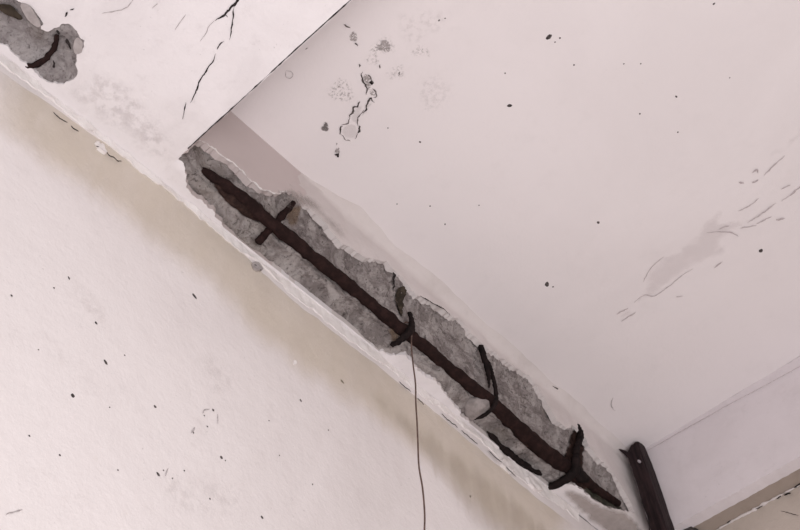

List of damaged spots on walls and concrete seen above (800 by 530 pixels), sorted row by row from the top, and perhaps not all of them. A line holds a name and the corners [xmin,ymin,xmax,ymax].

crack [183,0,351,149]
corrosion [214,175,259,222]
spalling [0,0,579,522]
corrosion [564,430,584,470]
spalling [582,449,628,511]